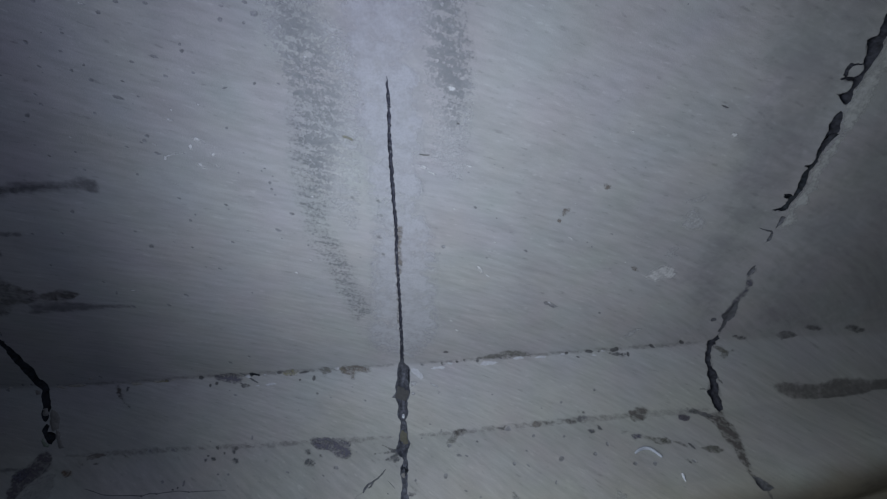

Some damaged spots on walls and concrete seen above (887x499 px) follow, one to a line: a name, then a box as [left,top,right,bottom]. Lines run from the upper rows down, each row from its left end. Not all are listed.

crack [0,332,175,499]
crack [86,487,225,498]
crack [198,366,368,388]
water stain [344,0,434,354]
crack [362,76,656,499]
crack [705,265,774,491]
crack [760,14,887,242]